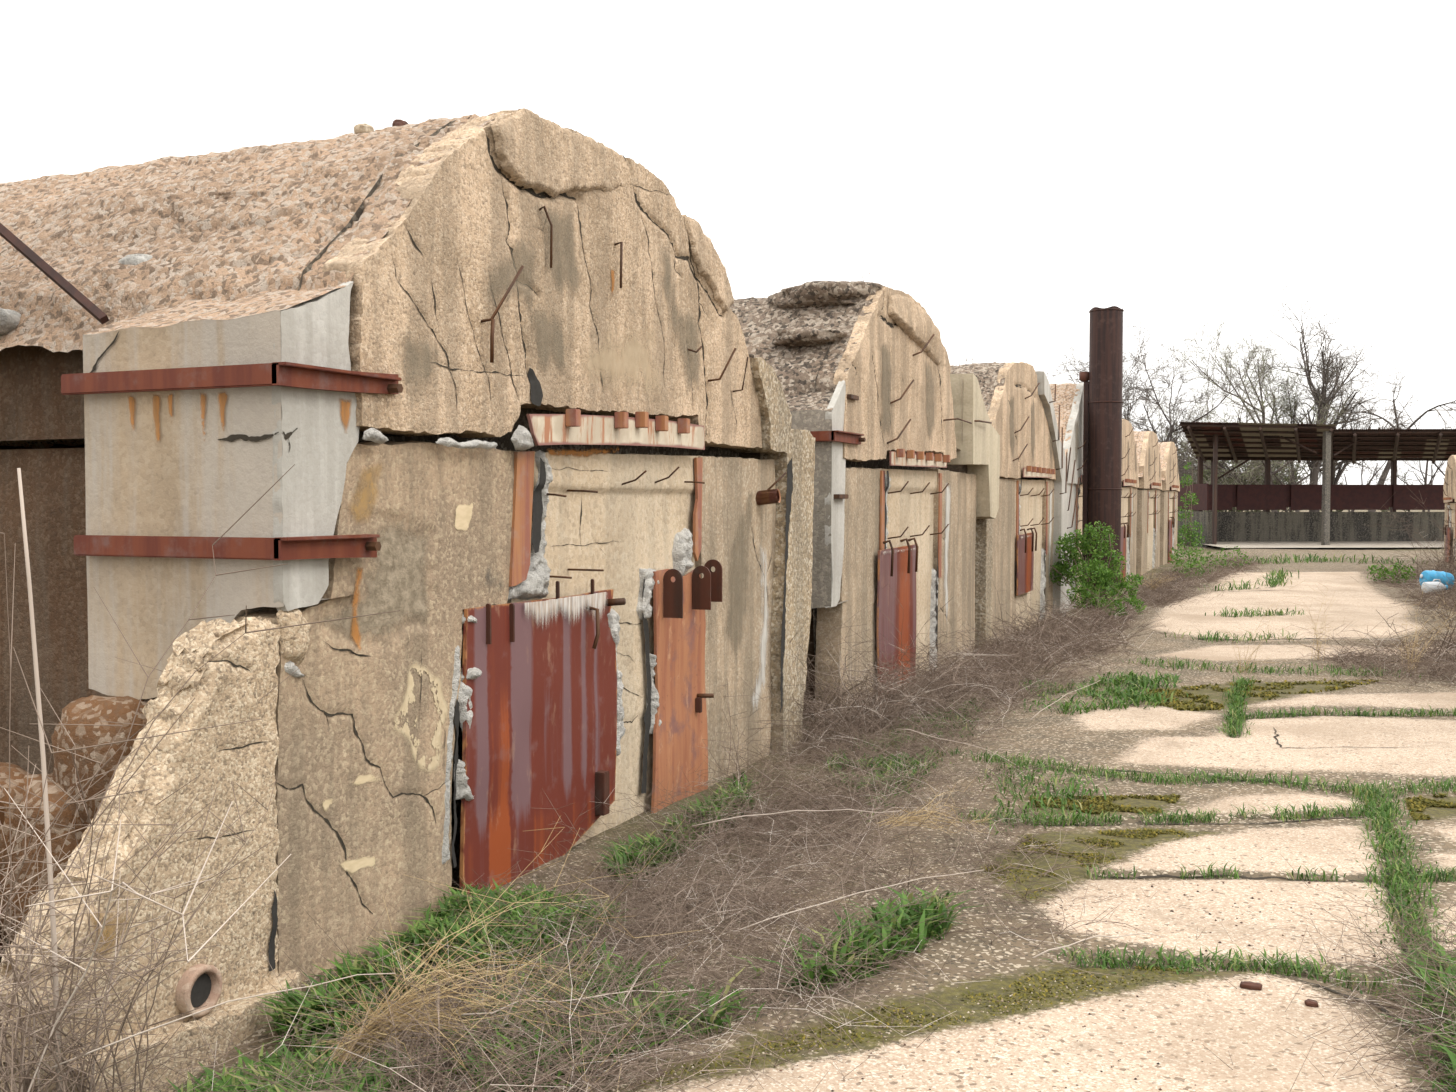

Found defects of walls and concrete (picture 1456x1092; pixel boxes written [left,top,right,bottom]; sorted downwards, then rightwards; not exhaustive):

crack [393,129,603,416]
crack [623,155,737,439]
rust [153,394,172,441]
rust [200,392,227,434]
crack [218,428,298,452]
crack [855,298,904,549]
crack [276,782,373,914]
crack [327,643,368,657]
rust [351,569,362,648]
crack [303,650,460,868]
peeling [393,646,482,865]
spalling [436,425,694,756]